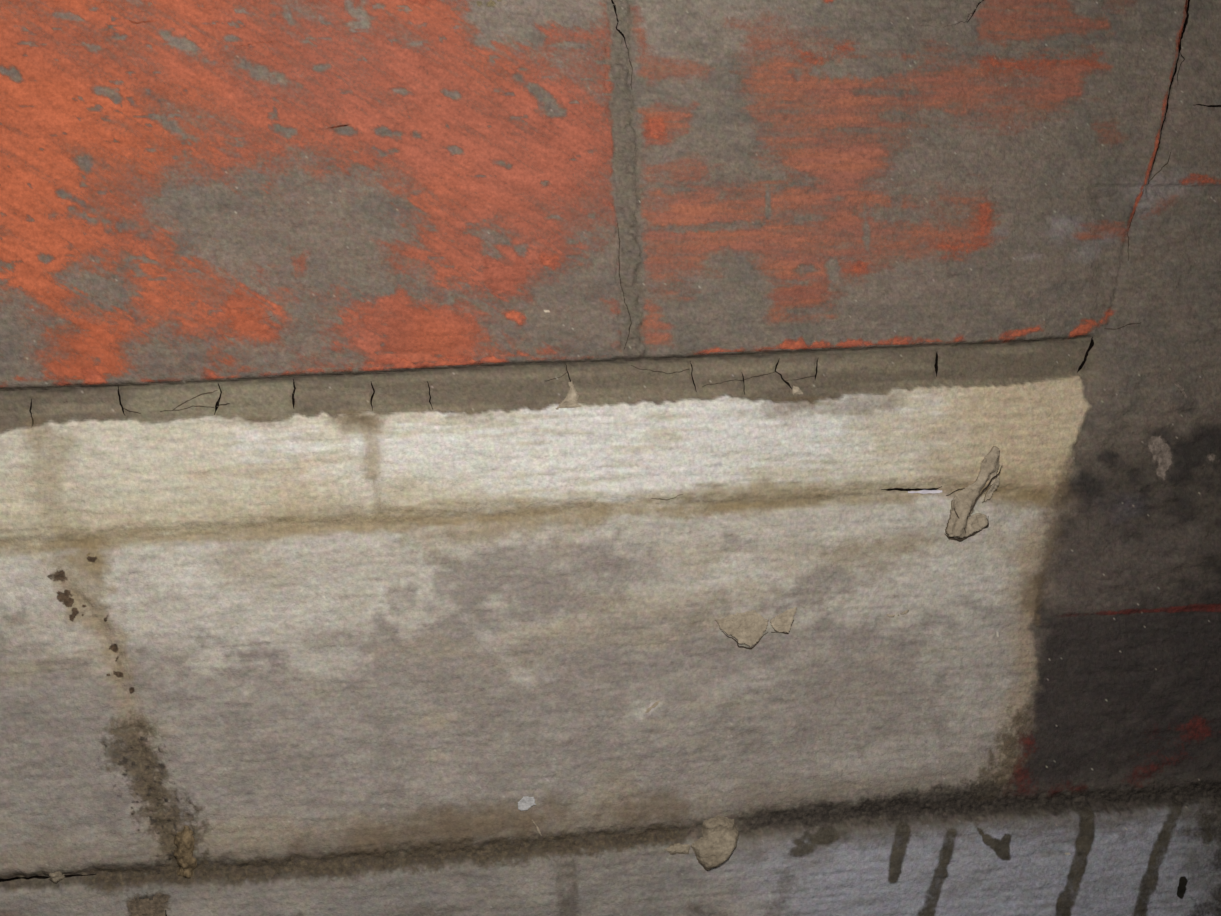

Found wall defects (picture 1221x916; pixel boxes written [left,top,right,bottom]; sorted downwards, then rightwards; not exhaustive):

crack [1127,0,1221,261]
peeling [0,0,614,386]
peeling [642,39,1111,320]
peeling [759,337,939,351]
crack [932,352,940,376]
peeling [1002,327,1040,342]
peeling [1070,310,1113,337]
crack [117,384,230,415]
crack [290,379,298,408]
peeling [945,446,1002,542]
peeling [715,607,797,649]
damp [745,713,1221,916]